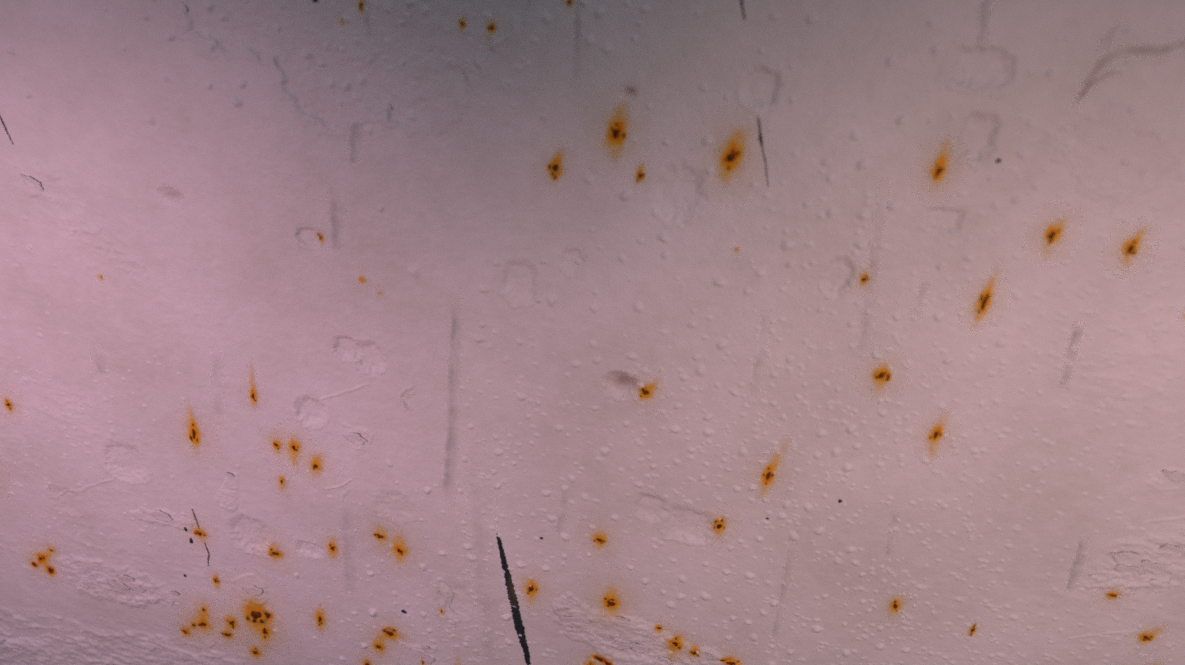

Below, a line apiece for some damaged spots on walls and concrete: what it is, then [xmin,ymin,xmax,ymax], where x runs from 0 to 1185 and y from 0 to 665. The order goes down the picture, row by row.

corrosion [607,112,627,145]
corrosion [721,135,743,172]
corrosion [1045,225,1062,244]
corrosion [976,284,992,319]
corrosion [873,368,891,386]
corrosion [189,414,199,444]
corrosion [762,455,779,486]
corrosion [30,548,56,576]
corrosion [181,600,273,657]
peeling [551,591,742,665]